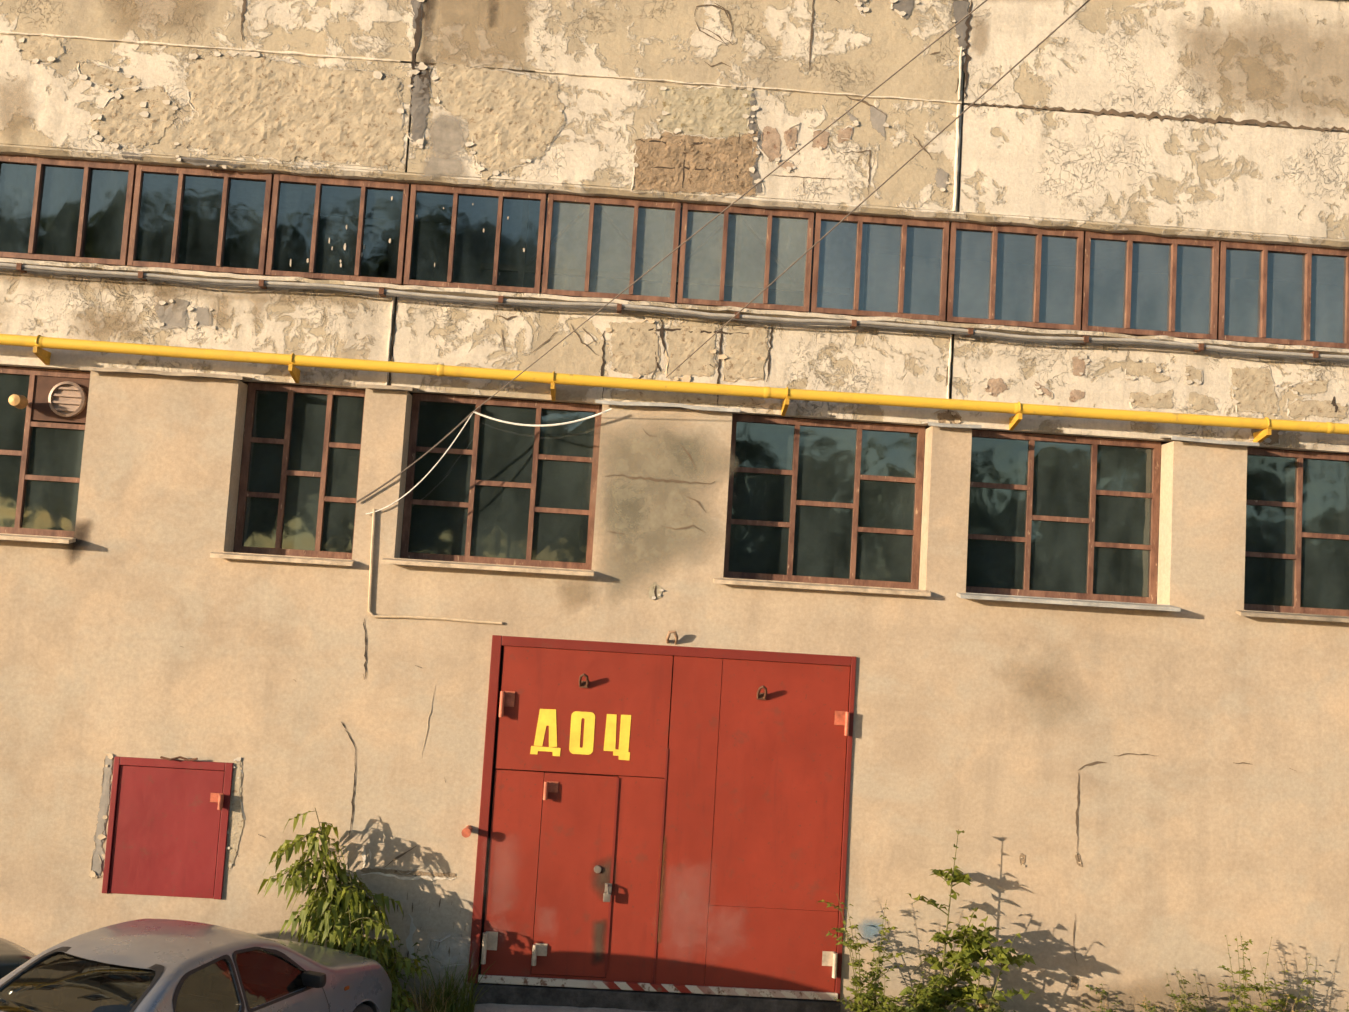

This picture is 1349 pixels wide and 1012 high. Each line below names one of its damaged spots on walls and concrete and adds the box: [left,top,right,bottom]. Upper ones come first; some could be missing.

crack [410,2,425,91]
crack [694,3,736,67]
crack [809,0,840,71]
peeling [890,0,920,20]
crack [929,0,972,99]
spalling [630,85,889,198]
peeling [154,298,216,333]
peeling [606,318,770,407]
peeling [1124,358,1217,435]
peeling [1228,365,1349,446]
crack [345,730,356,843]
crack [1076,753,1154,865]